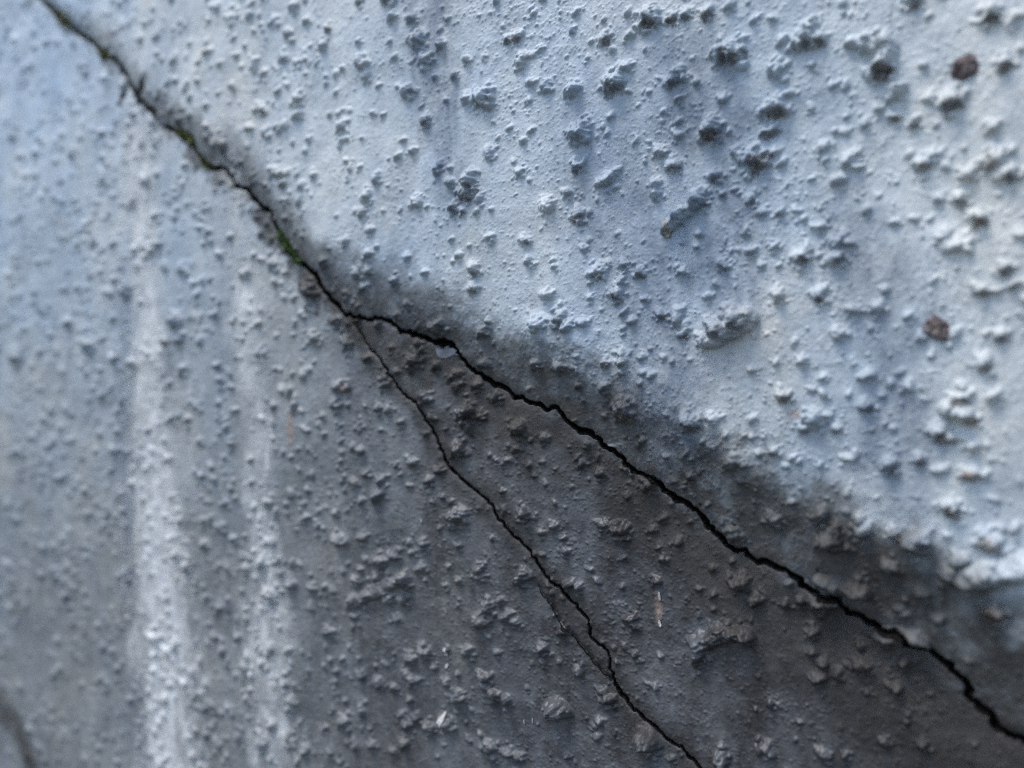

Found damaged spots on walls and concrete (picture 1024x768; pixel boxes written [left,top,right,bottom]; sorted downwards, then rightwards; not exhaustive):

crack [41,0,291,256]
crack [302,261,1024,768]